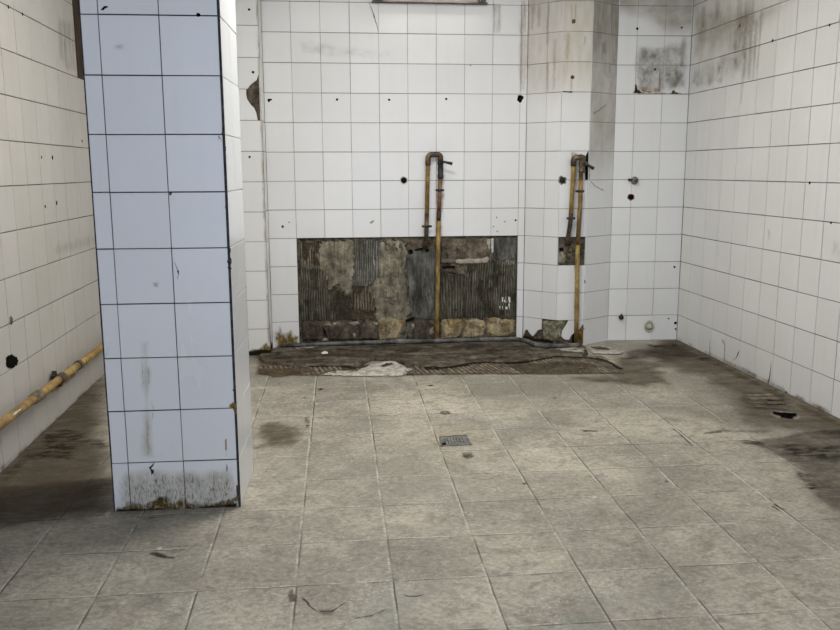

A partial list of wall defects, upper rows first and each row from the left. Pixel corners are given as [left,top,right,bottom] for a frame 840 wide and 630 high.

spalling [246,74,272,120]
peeling [297,236,585,344]
damp [752,430,840,503]